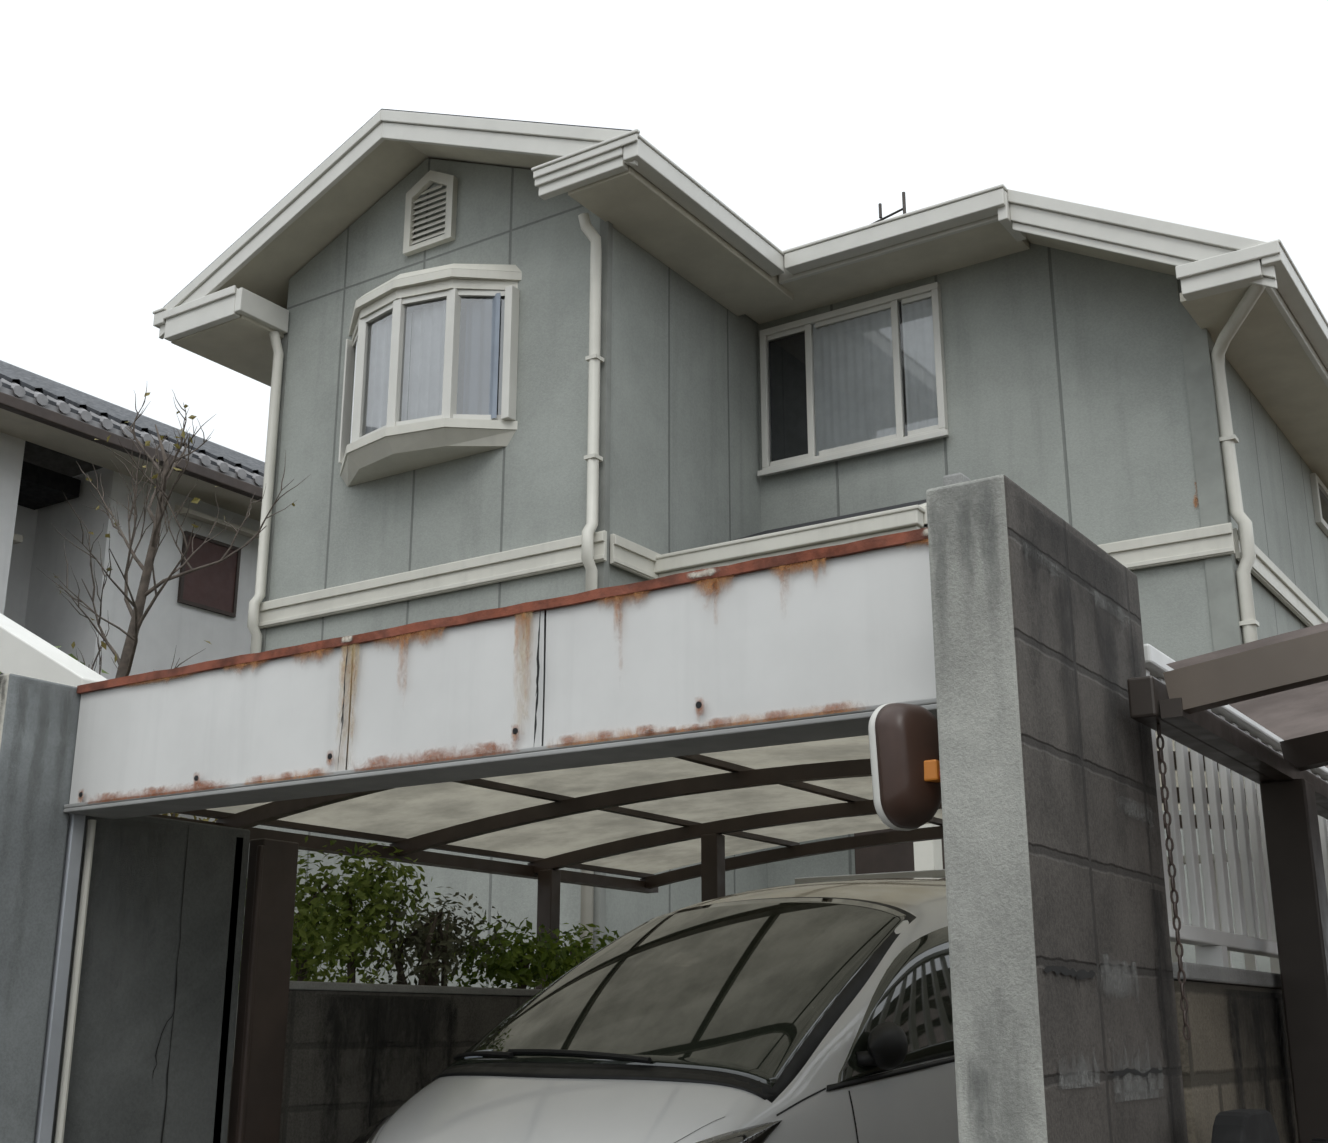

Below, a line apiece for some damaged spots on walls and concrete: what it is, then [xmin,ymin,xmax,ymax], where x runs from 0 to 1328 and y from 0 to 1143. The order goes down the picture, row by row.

corrosion [562,700,856,746]
corrosion [361,727,518,771]
crack [1108,1068,1163,1090]